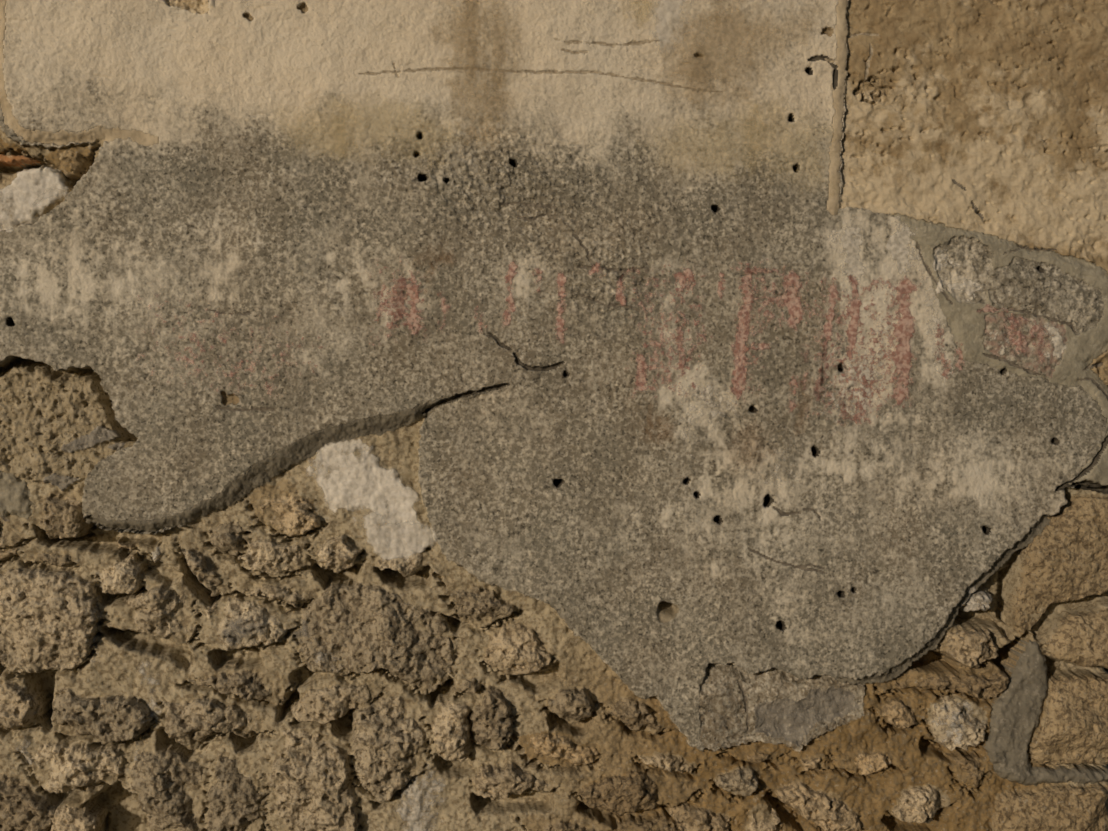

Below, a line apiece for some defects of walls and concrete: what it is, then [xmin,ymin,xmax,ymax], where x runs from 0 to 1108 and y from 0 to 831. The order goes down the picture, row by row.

crack [359,38,723,93]
crack [422,332,565,414]
crack [1078,362,1108,400]
spalling [0,355,138,491]
crack [1055,436,1108,494]
spalling [699,663,865,752]